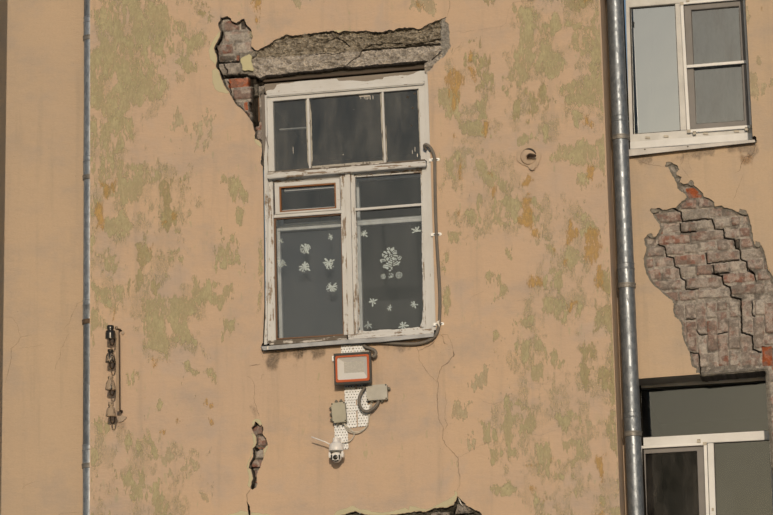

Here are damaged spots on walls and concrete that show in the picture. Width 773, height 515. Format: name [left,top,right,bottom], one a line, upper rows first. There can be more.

peeling [438,0,604,146]
peeling [549,134,606,185]
peeling [443,147,618,456]
spalling [644,162,773,471]
spalling [247,419,268,490]
peeling [334,491,463,515]
peeling [467,299,604,497]